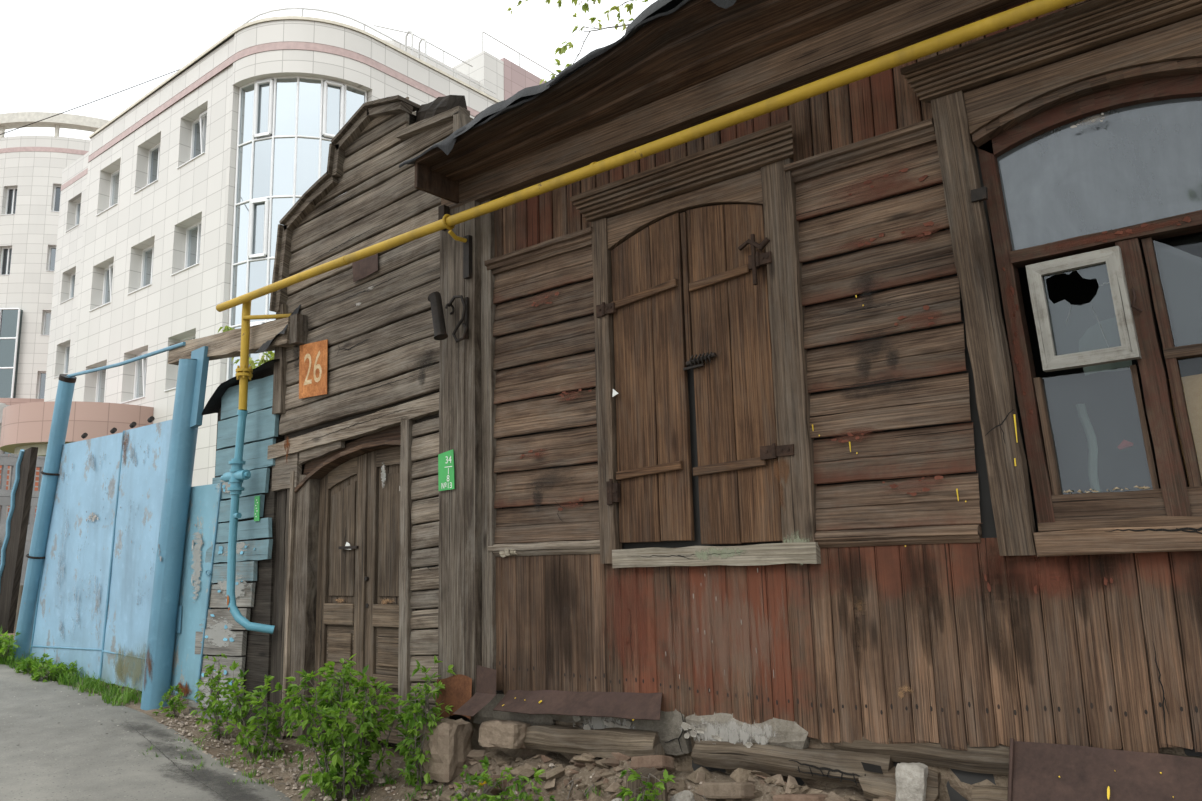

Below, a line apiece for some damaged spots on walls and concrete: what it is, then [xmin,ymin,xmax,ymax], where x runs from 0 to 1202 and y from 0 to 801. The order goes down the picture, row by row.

crack [1106,526,1202,534]
peeling [191,524,204,601]
peeling [218,542,255,556]
peeling [217,575,252,602]
flaking render [681,722,754,748]
corrosion [1007,738,1202,801]